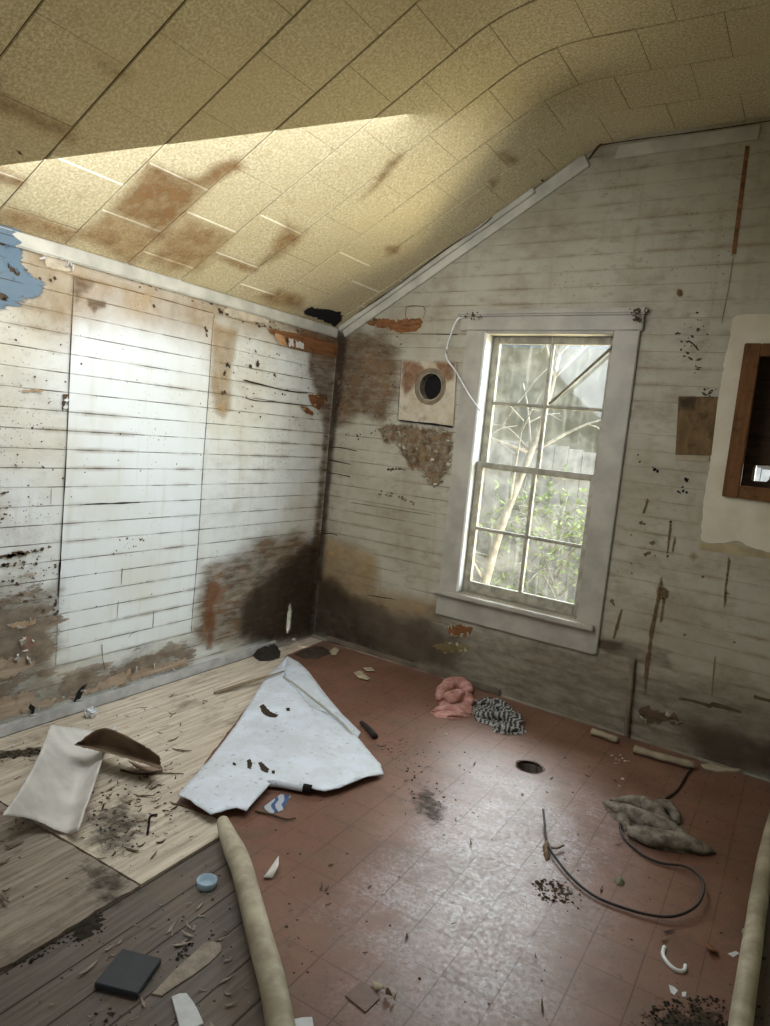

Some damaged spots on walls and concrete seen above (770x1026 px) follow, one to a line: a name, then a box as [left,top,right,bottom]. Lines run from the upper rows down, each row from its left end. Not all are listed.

leakage [87,161,240,260]
peeling [8,252,75,282]
peeling [1,375,70,411]
peeling [174,292,454,487]
leakage [195,327,454,667]
peeling [0,545,196,721]
rust [644,579,669,691]